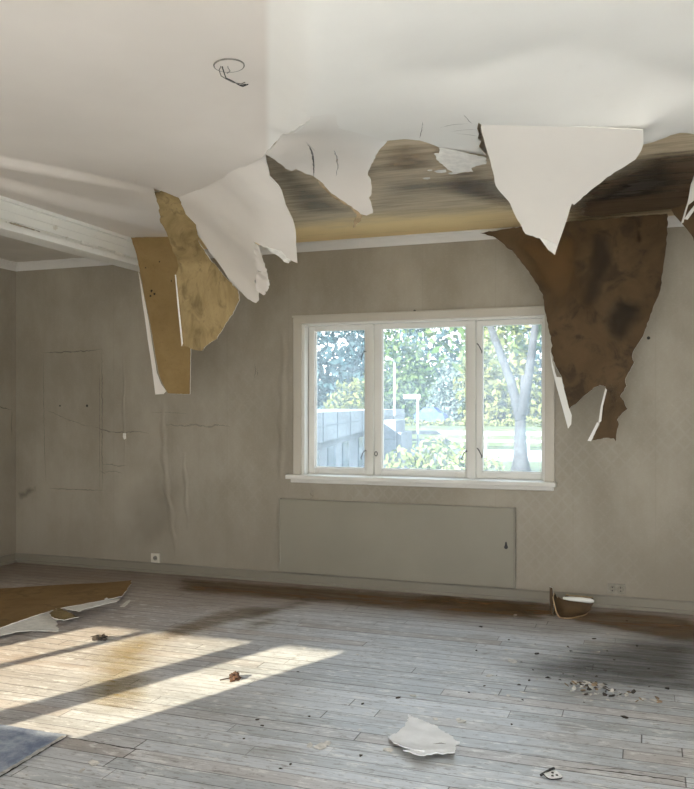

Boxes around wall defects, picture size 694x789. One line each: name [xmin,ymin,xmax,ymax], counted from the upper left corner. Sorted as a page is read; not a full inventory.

peeling [179,114,694,303]
damp [522,238,573,298]
crack [45,349,127,491]